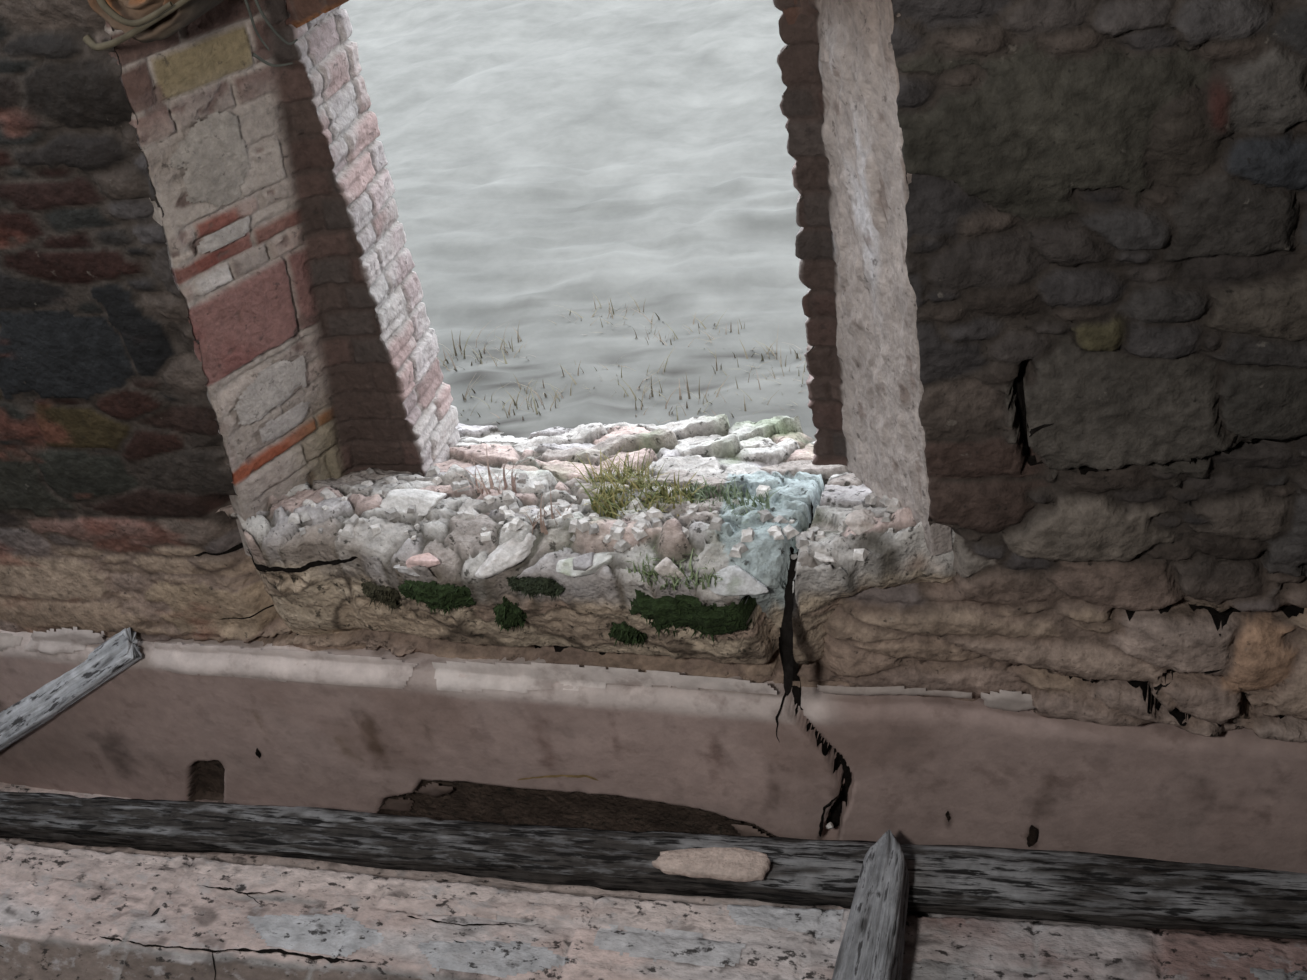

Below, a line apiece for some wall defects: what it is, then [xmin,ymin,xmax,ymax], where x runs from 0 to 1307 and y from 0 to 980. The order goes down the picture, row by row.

crack [775,477,851,837]
spalling [378,780,776,837]
crack [76,932,374,980]
crack [408,916,538,943]